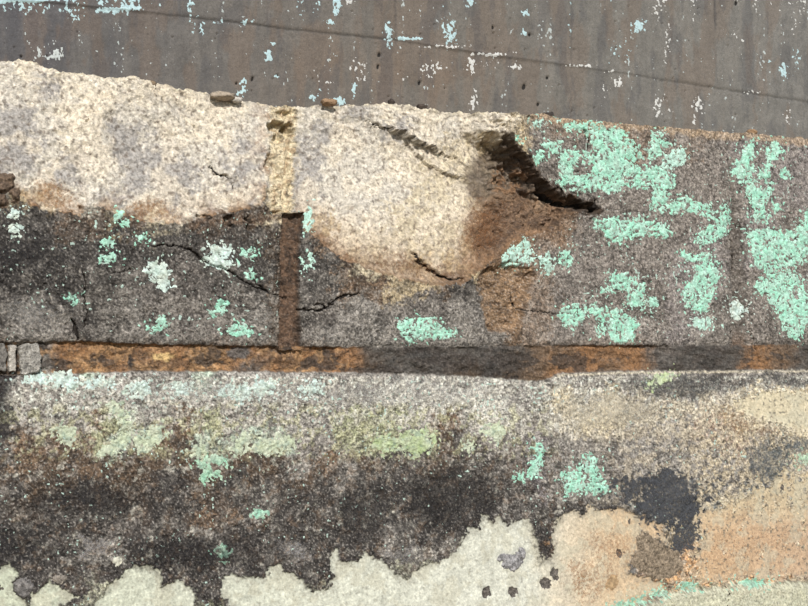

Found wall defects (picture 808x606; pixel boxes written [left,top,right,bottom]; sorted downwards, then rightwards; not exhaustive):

spalling [291,102,603,335]
crack [154,244,358,312]
leakage [138,537,255,570]
leakage [598,467,714,560]